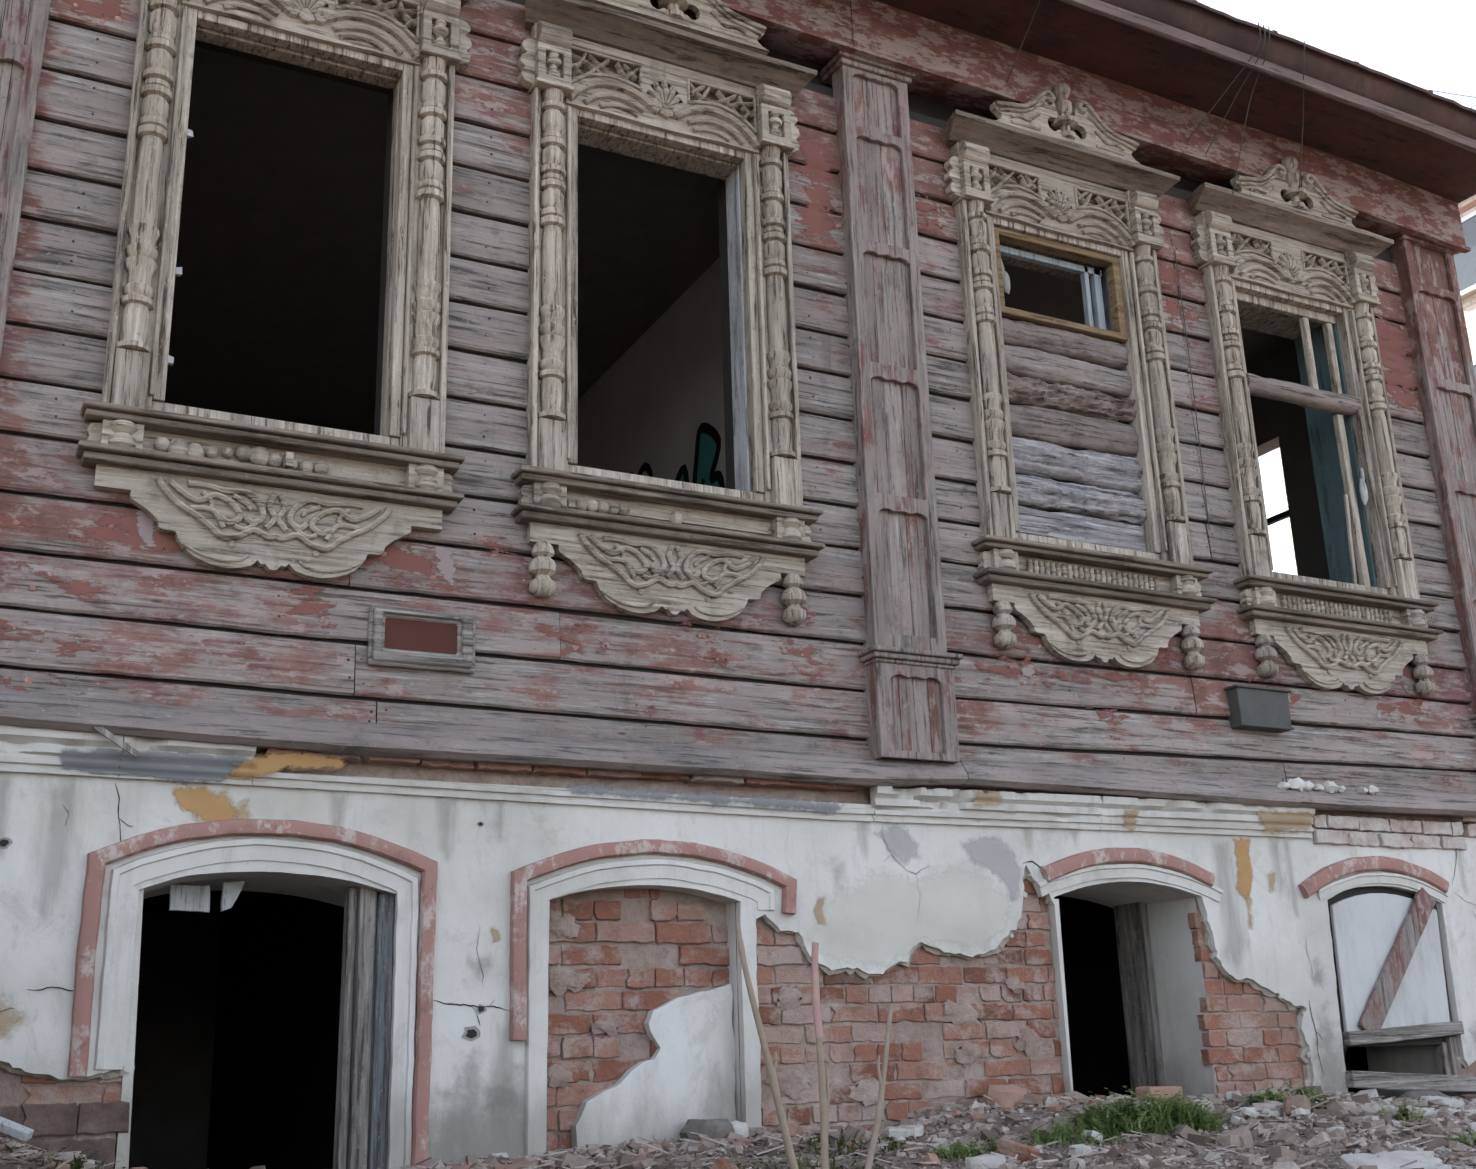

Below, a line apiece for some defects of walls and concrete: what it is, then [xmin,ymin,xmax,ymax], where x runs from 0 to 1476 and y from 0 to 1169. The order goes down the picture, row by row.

peeling [788,127,845,249]
peeling [69,499,183,565]
peeling [0,561,109,602]
peeling [283,541,470,634]
peeling [0,610,107,696]
peeling [975,623,1141,740]
peeling [1289,669,1423,726]
crack [882,824,930,918]
flaking render [1311,814,1476,850]
flaking render [756,838,1065,1133]
flaking render [1188,912,1311,1094]
flaking render [21,1064,135,1110]